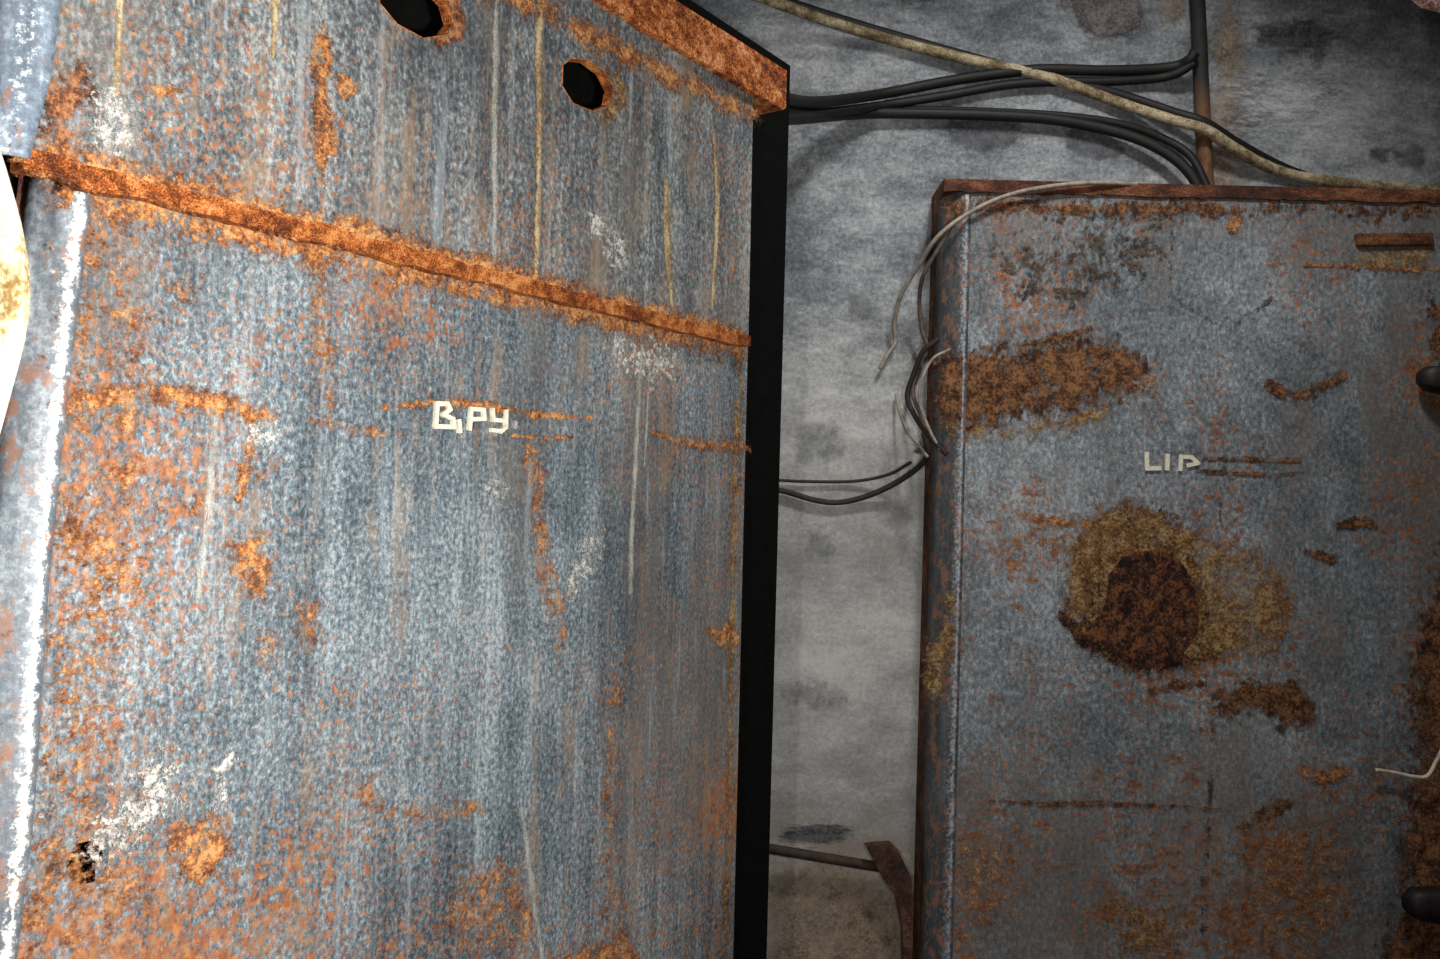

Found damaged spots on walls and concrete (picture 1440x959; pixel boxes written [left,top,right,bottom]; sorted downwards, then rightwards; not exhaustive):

rust [431,0,761,127]
leakage [1251,20,1349,66]
rust [10,59,750,959]